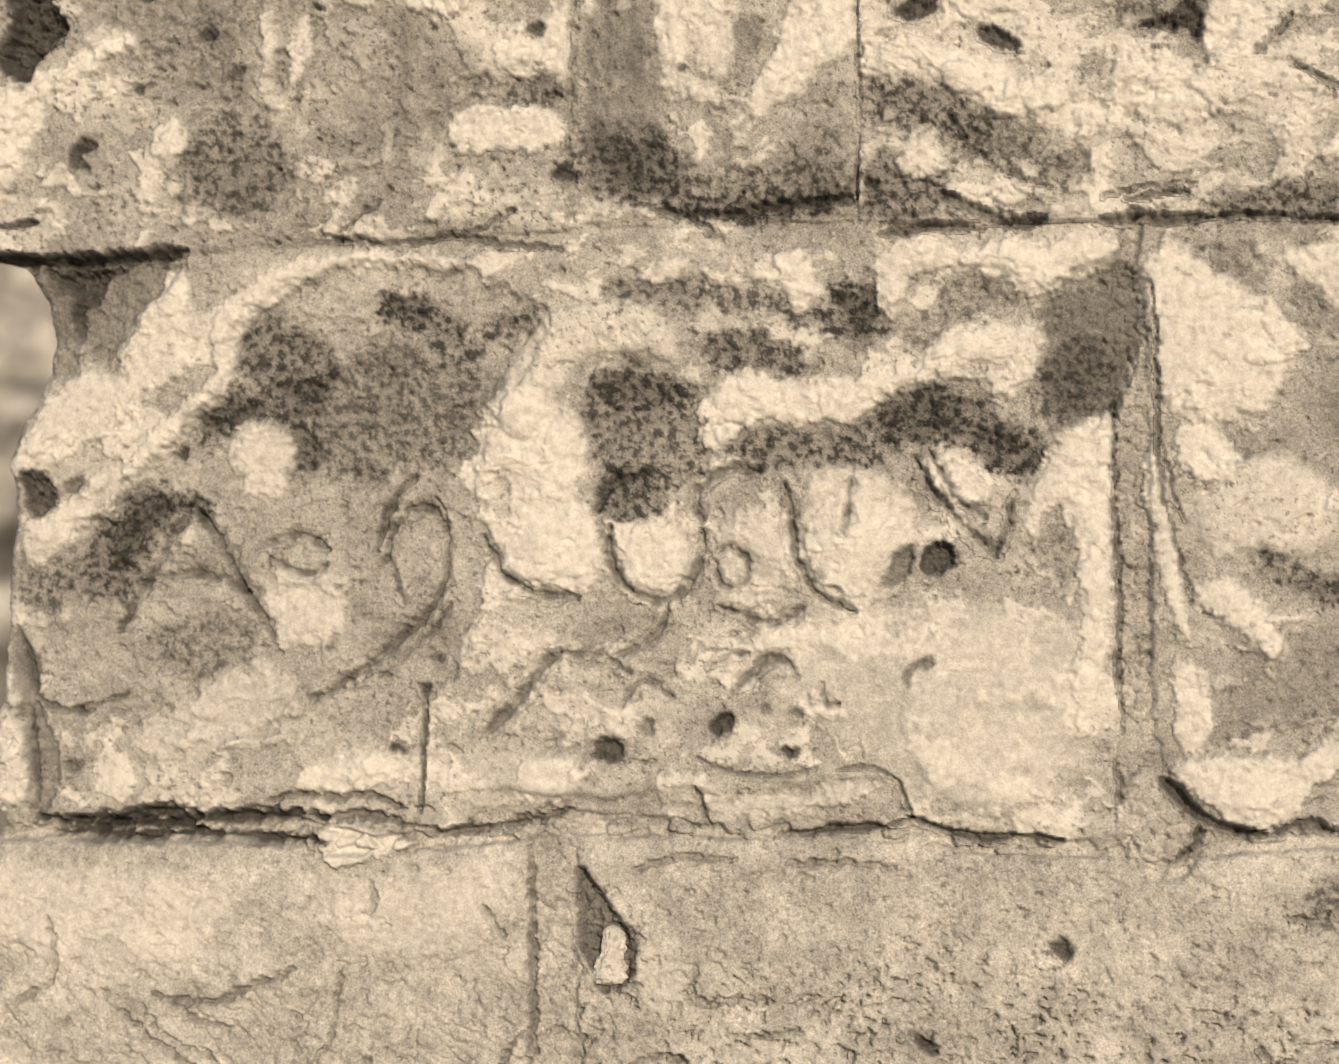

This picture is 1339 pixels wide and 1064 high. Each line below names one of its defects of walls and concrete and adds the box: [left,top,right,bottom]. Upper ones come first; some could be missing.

peeling [0,0,143,210]
peeling [148,114,191,162]
spalling [568,863,699,1026]